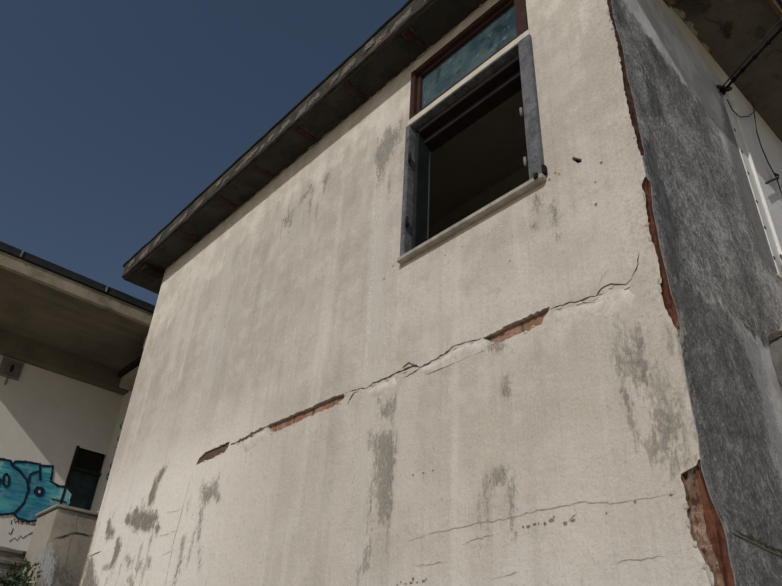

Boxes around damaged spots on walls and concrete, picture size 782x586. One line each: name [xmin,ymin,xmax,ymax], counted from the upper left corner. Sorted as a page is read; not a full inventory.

leakage [612,0,782,586]
leakage [350,128,396,586]
crack [347,339,479,404]
crack [230,426,267,445]
leakage [80,519,151,586]
leakage [125,465,167,534]
leakage [198,473,220,537]
crack [414,494,667,544]
spalling [681,465,735,586]